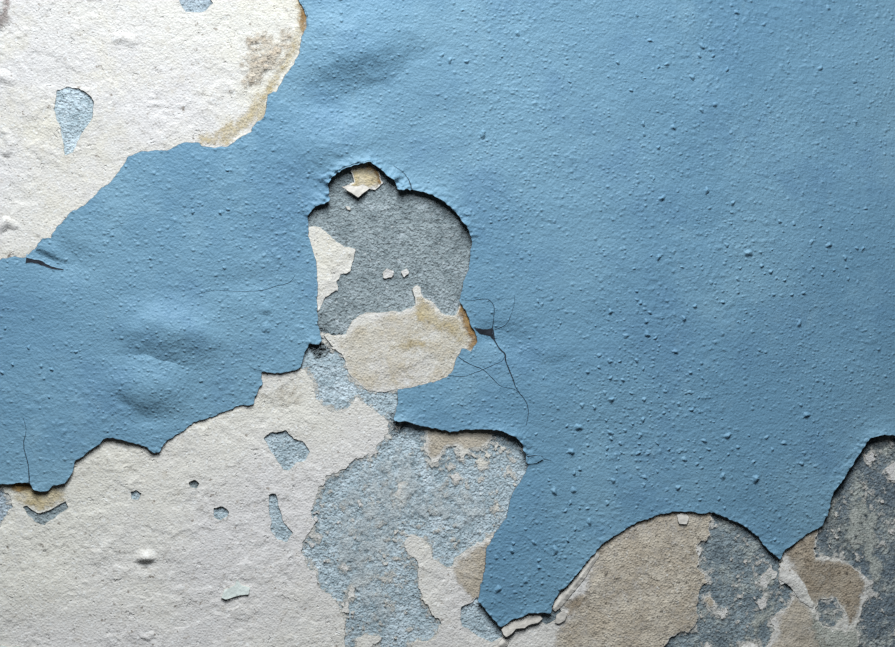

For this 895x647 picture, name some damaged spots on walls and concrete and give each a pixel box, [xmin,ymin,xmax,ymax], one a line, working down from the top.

spalling [179,0,213,13]
spalling [54,87,94,155]
spalling [0,484,68,527]
spalling [264,430,310,471]
peeling [300,162,528,647]
crack [448,295,529,425]
peeling [664,512,793,647]
peeling [814,435,895,647]